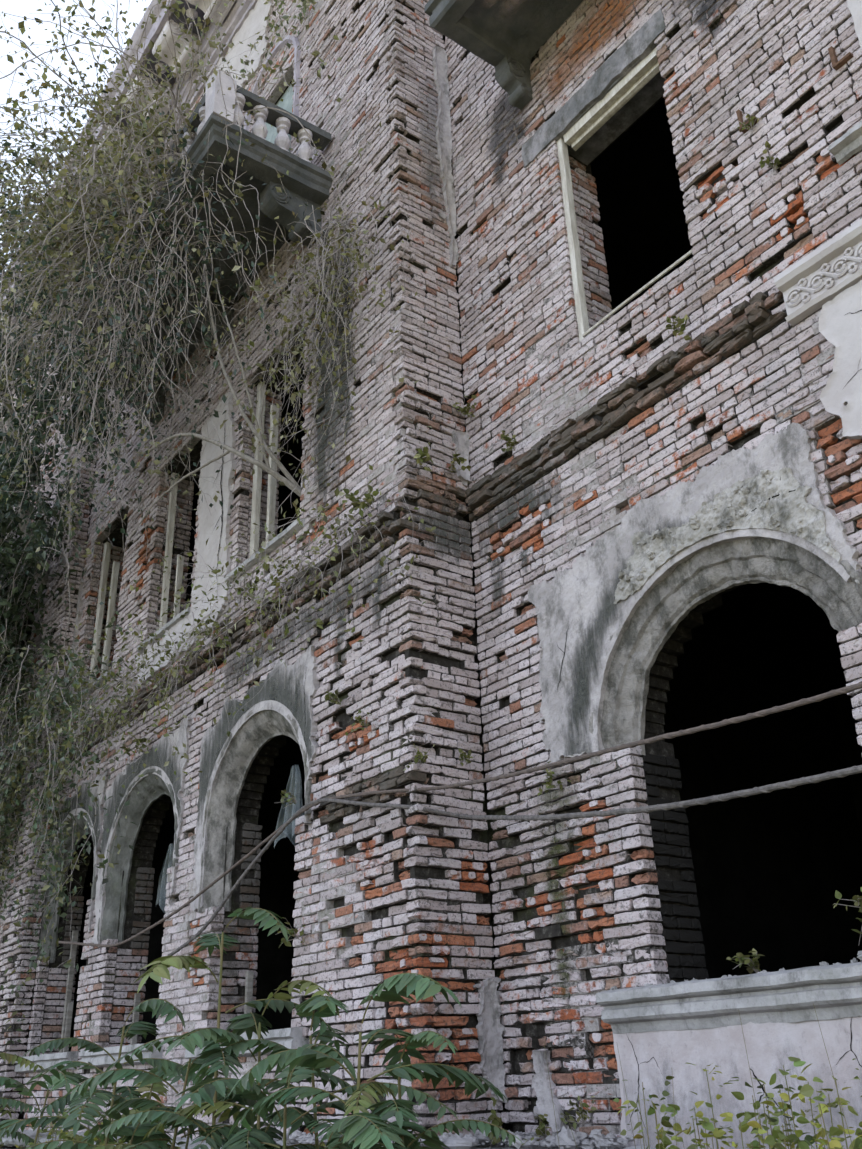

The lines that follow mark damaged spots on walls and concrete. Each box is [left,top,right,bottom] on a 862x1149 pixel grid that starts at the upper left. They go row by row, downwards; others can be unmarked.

spalling [613,280,862,604]
damp [197,554,388,812]
damp [568,567,626,756]
damp [49,744,181,862]
crack [836,1018,862,1067]